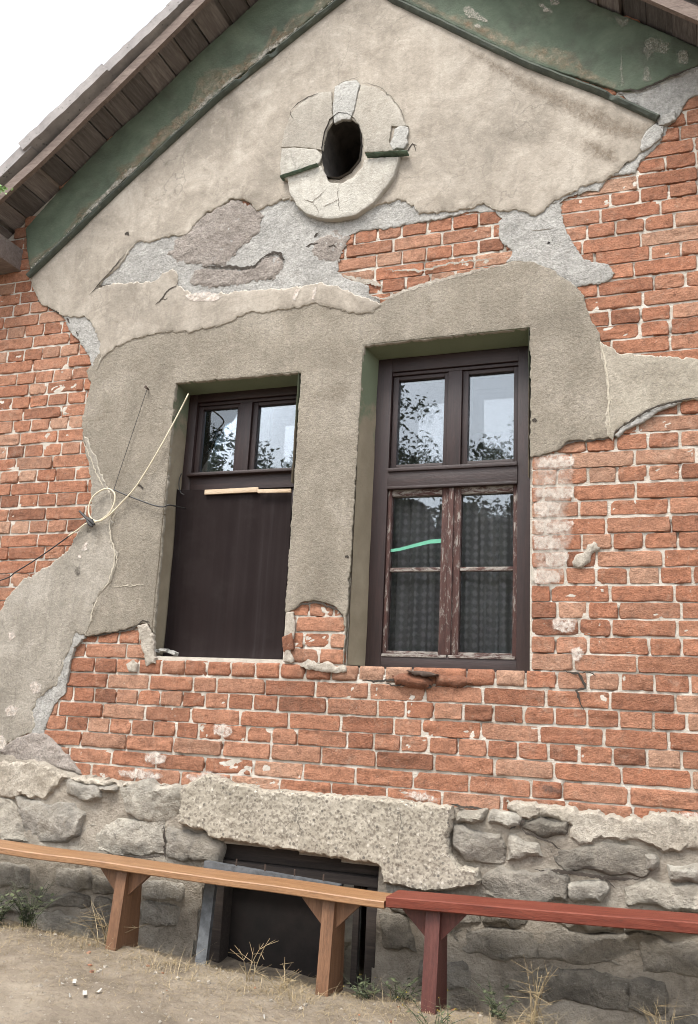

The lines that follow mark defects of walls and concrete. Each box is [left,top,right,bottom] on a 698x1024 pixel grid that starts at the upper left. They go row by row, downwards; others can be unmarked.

flaking render [99,51,698,303]